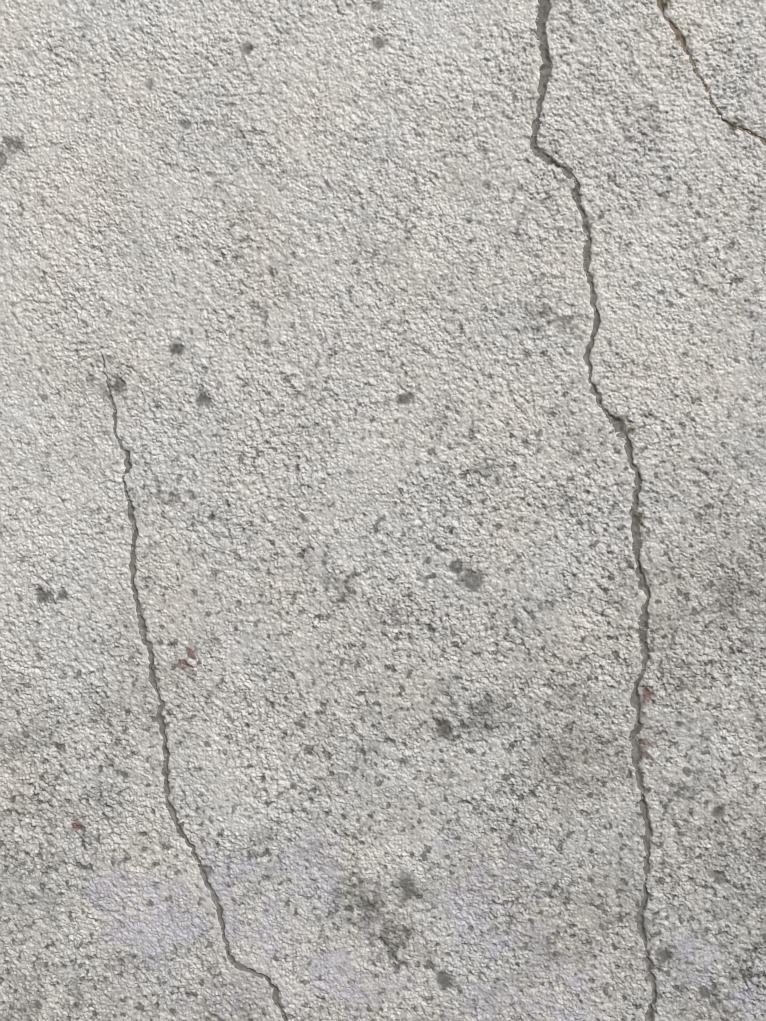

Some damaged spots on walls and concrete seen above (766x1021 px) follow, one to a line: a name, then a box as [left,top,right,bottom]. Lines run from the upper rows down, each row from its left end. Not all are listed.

crack [656,0,766,146]
crack [101,354,288,1021]
crack [530,0,658,1021]